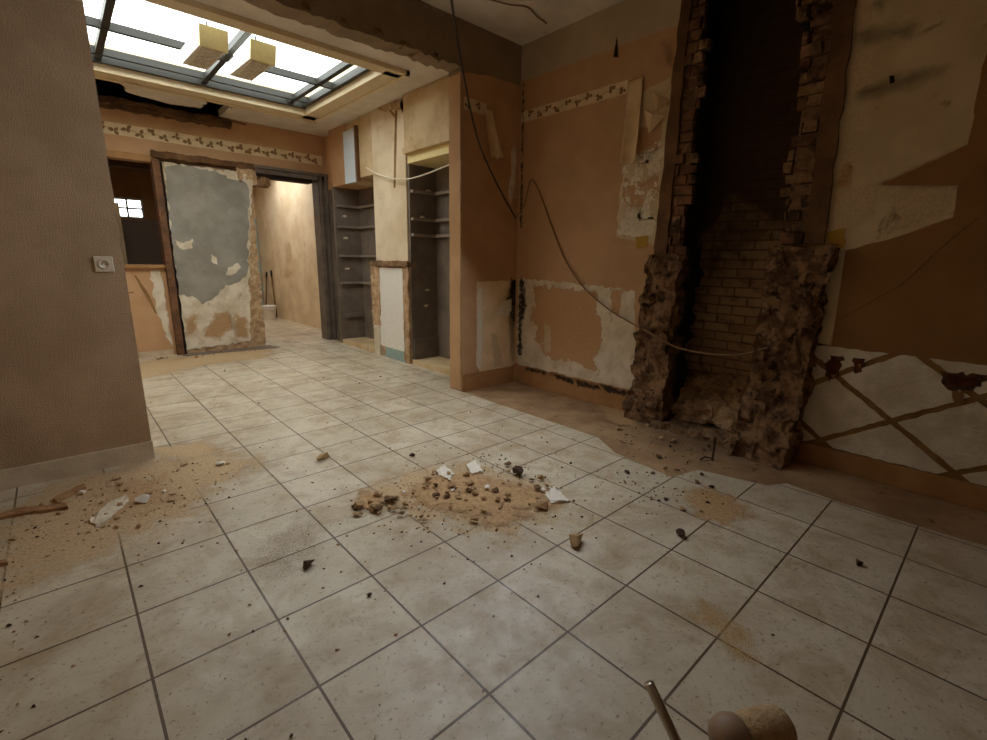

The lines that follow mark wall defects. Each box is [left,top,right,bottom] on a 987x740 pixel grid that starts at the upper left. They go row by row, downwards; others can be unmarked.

peeling [224,170,271,188]
peeling [175,239,193,250]
flaking render [727,0,987,487]
peeling [211,255,241,275]
flaking render [476,85,704,438]